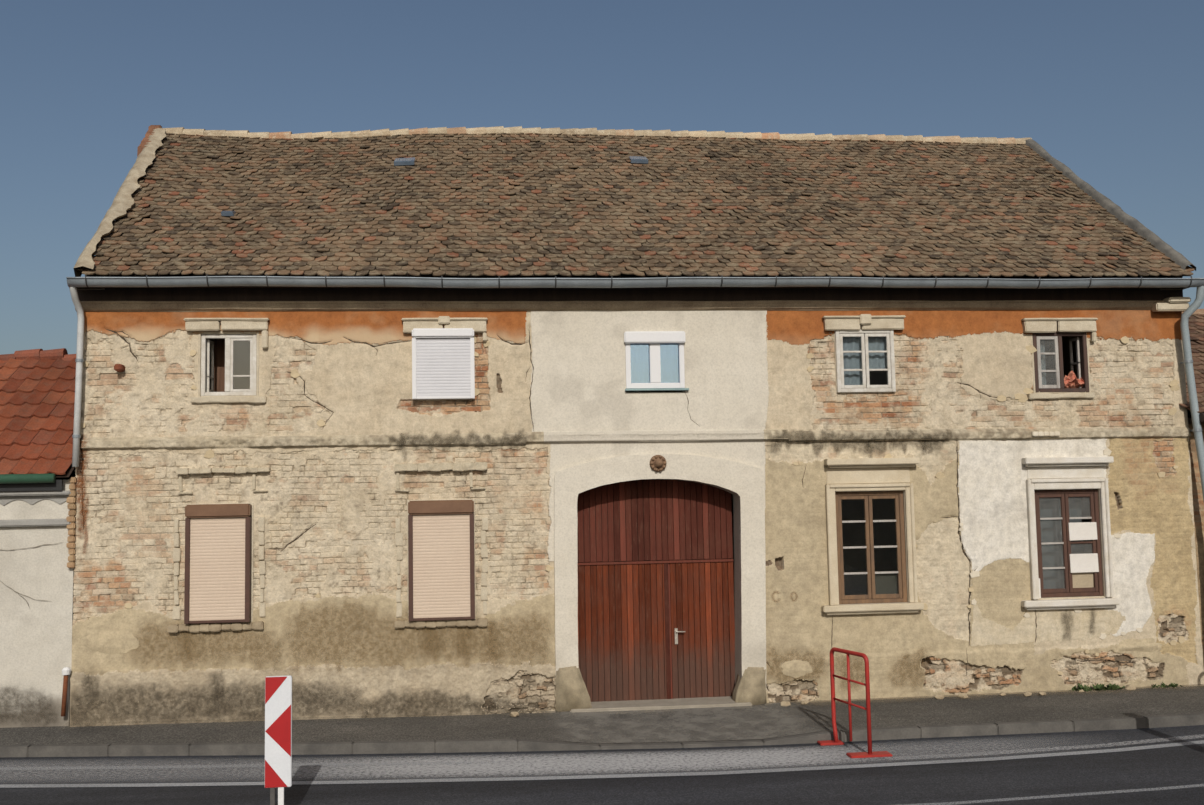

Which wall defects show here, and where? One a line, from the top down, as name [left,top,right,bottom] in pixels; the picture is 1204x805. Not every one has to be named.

crack [293,337,408,355]
crack [288,372,334,429]
flaking render [73,329,554,624]
flaking render [765,333,1189,687]
crack [943,445,977,676]
water stain [296,610,543,661]
water stain [72,676,265,723]
water stain [292,689,538,717]
flaking render [482,670,556,714]
flaking render [921,656,1024,695]